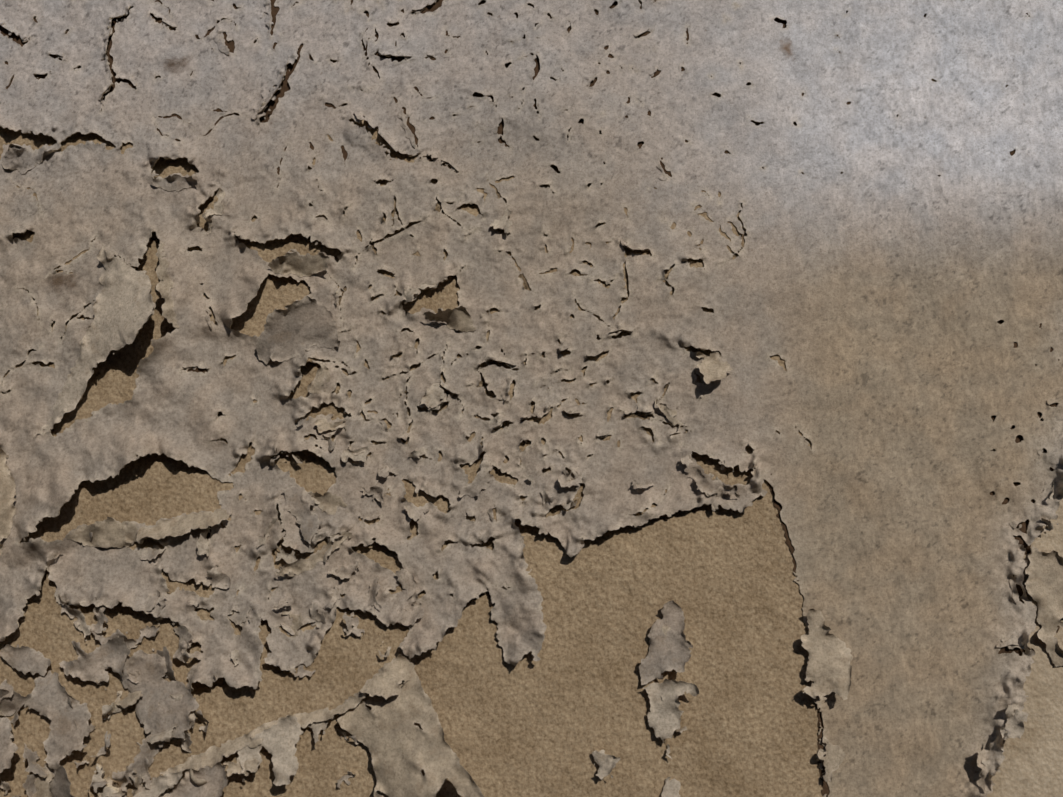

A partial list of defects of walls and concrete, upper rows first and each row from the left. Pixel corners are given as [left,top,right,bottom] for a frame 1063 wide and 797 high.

crack [260,0,280,36]
crack [0,6,235,111]
crack [214,44,304,123]
peeling [12,230,35,242]
peeling [0,127,133,200]
peeling [148,157,199,192]
peeling [197,188,225,234]
crack [308,103,459,173]
peeling [355,178,422,265]
peeling [436,176,515,234]
peeling [0,232,853,797]
peeling [977,485,1063,797]